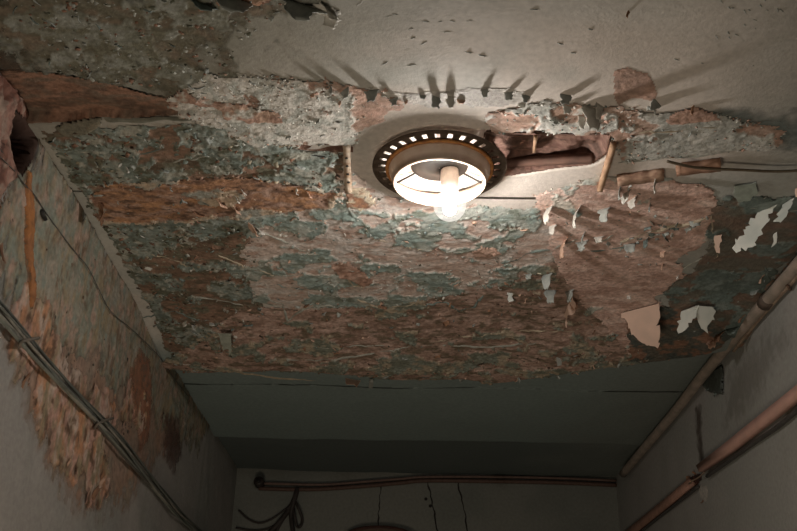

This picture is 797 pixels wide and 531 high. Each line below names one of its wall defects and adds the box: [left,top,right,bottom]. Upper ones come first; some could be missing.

peeling [0,0,341,124]
spalling [0,67,797,455]
peeling [8,336,113,510]